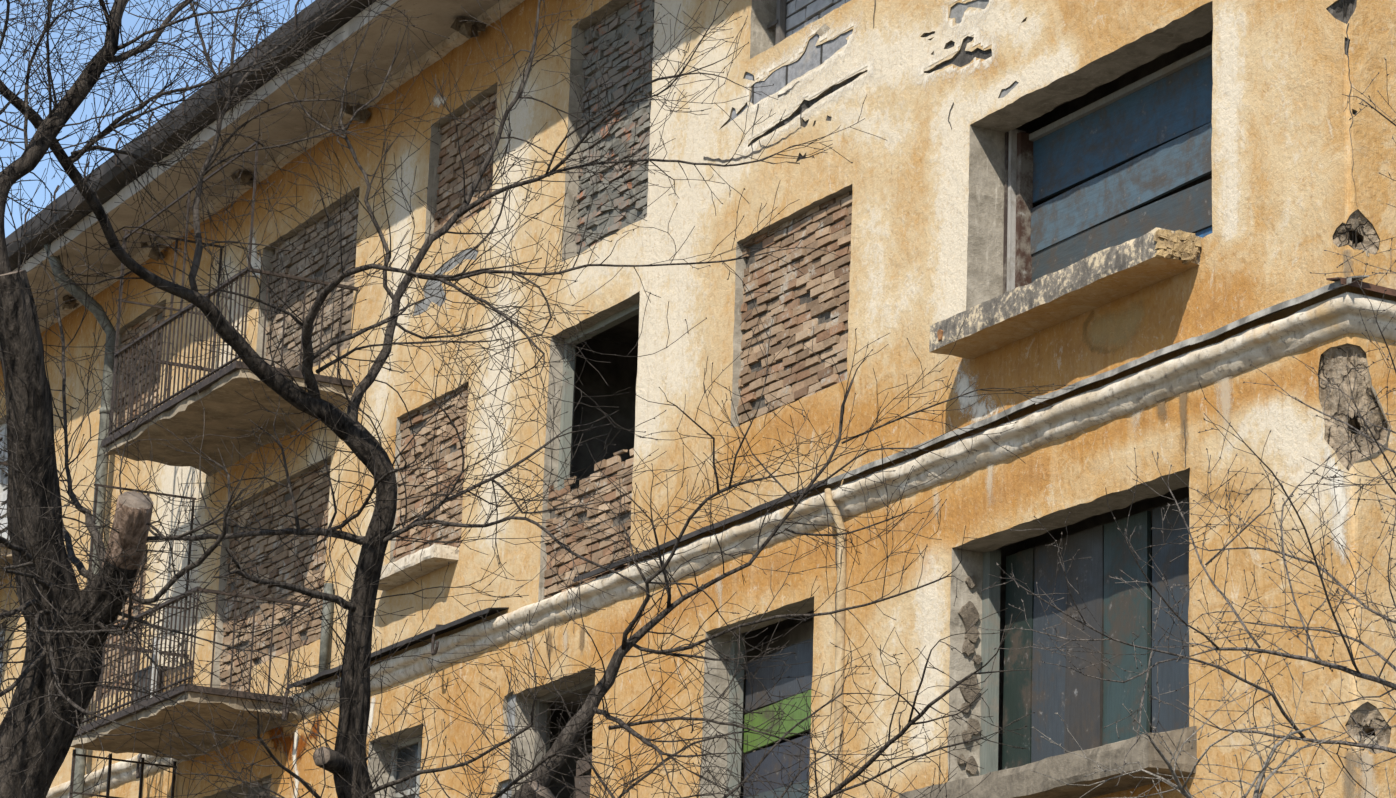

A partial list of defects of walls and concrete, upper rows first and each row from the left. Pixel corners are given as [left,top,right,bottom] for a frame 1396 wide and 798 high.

peeling [727,20,859,124]
peeling [916,0,999,86]
flaking render [1327,0,1357,55]
flaking render [1333,210,1380,256]
flaking render [1318,344,1391,471]
peeling [957,576,982,774]
flaking render [1345,702,1391,754]